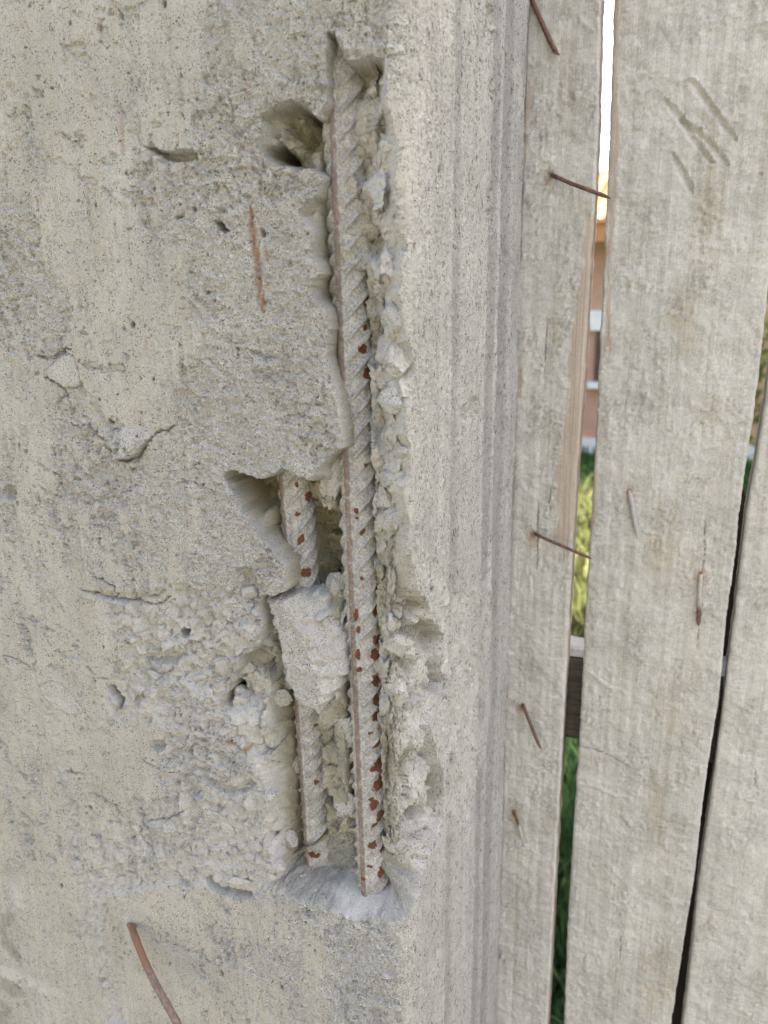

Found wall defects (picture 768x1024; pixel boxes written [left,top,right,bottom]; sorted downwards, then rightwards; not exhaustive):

corrosion [247,196,270,319]
corrosion [357,324,371,380]
spalling [82,30,495,924]
corrosion [295,481,312,518]
corrosion [301,566,316,585]
corrosion [354,608,385,883]